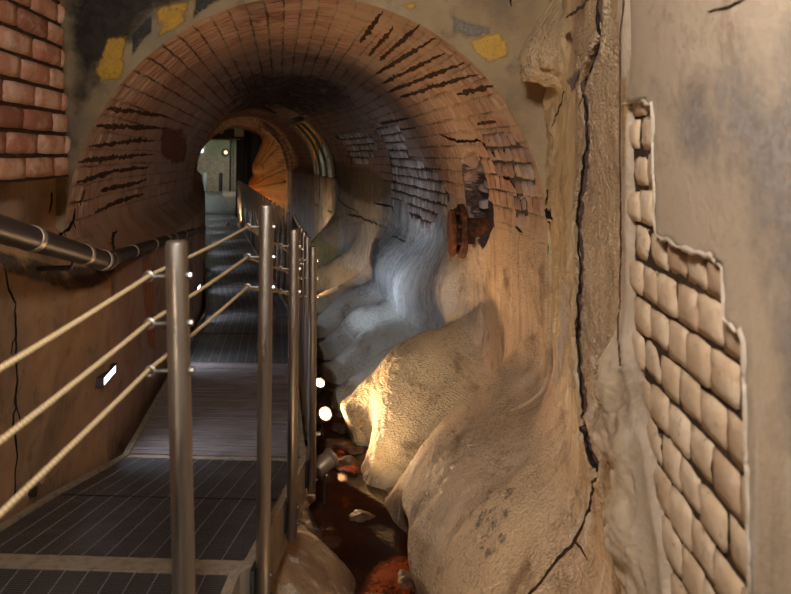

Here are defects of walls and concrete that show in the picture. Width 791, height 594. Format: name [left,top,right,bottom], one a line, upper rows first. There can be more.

peeling [96,0,216,81]
peeling [472,34,508,62]
crack [707,0,744,12]
spalling [462,132,536,248]
crack [4,263,21,496]
crack [528,0,625,594]
spalling [623,99,752,594]